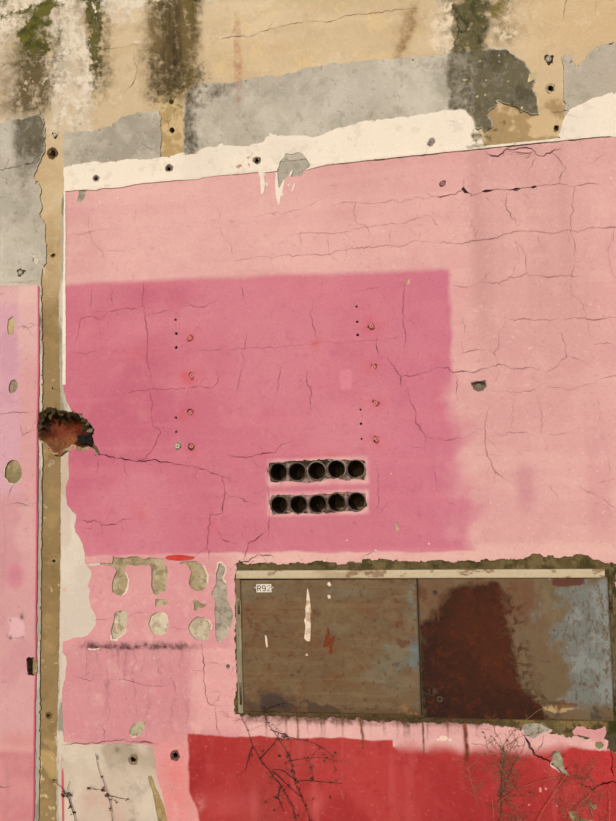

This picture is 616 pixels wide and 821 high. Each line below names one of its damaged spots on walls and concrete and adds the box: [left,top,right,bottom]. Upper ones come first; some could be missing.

water stain [0,0,245,159]
flaking render [81,0,435,172]
water stain [424,0,537,146]
flaking render [470,0,616,151]
flaking render [34,119,65,210]
peeling [264,159,310,204]
crack [438,185,536,219]
peeling [37,406,169,698]
rust [420,582,548,759]
crack [524,736,616,790]